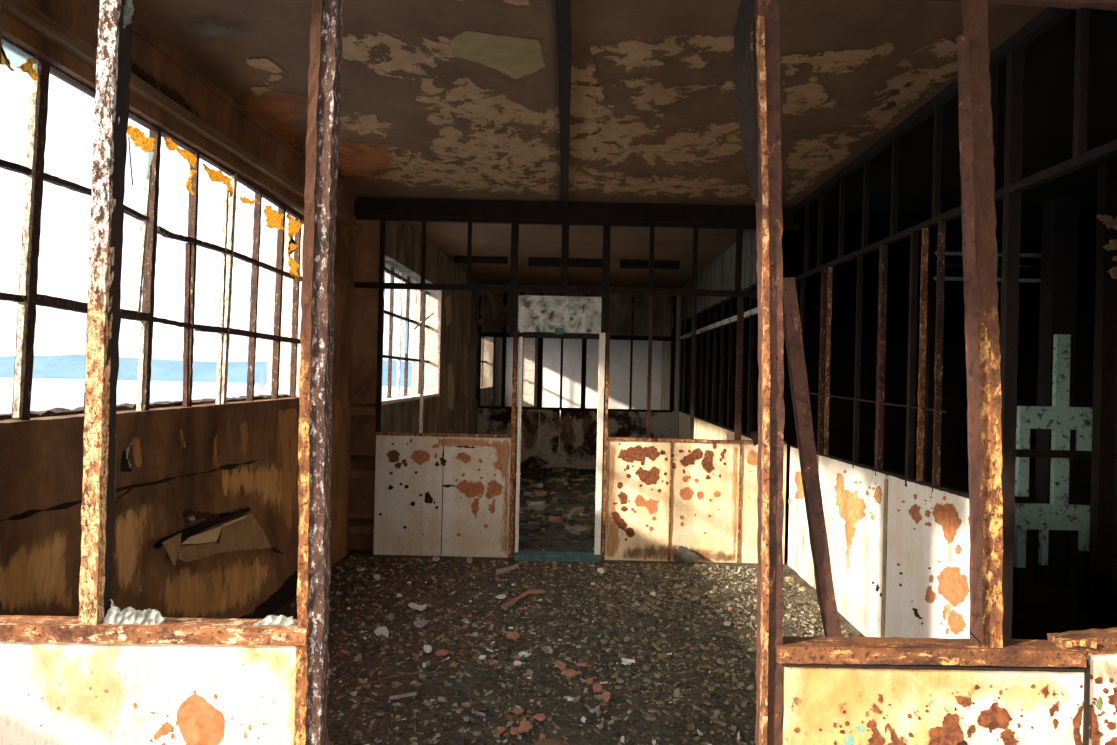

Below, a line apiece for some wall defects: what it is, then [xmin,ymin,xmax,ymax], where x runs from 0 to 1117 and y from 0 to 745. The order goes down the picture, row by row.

peeling [340,31,753,199]
crack [0,499,82,522]
crack [114,460,259,505]
corrosion [387,439,510,551]
corrosion [607,441,758,561]
corrosion [831,470,882,570]
corrosion [897,493,970,635]
corrosion [149,683,234,745]
corrosion [907,664,1117,745]